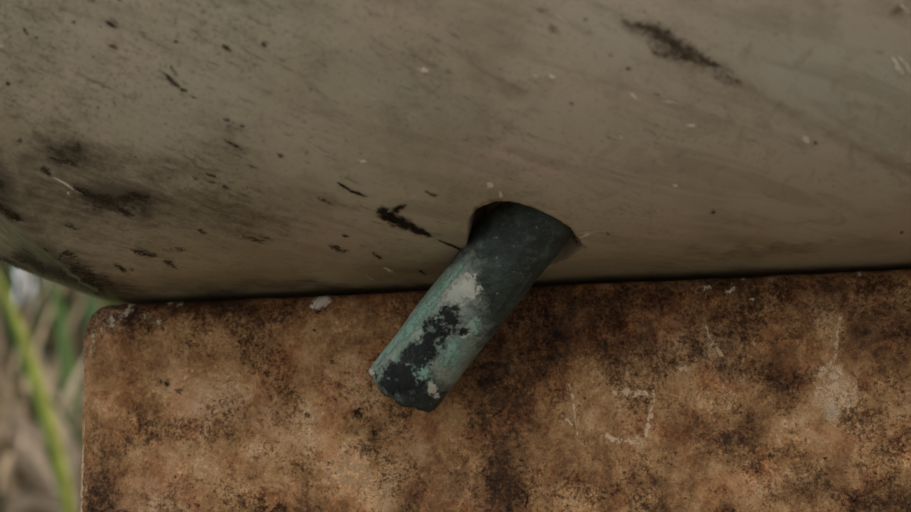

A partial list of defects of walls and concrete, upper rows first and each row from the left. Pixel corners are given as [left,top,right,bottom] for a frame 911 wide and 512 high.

leakage [624,21,740,84]
leakage [40,143,154,217]
leakage [0,248,117,296]
leakage [438,272,483,307]
leakage [428,381,440,399]
leakage [601,388,655,446]
leakage [814,316,858,423]